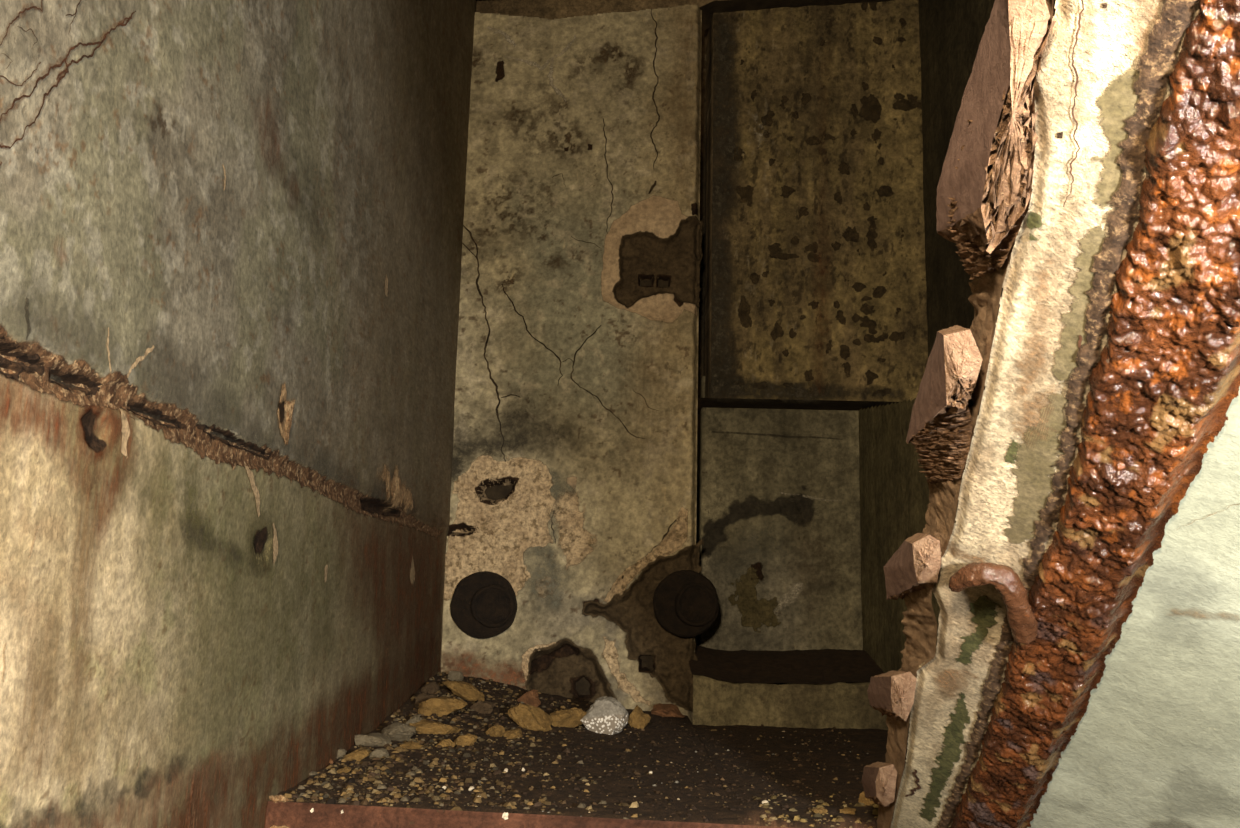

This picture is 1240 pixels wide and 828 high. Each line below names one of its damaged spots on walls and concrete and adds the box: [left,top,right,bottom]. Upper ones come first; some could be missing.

crack [0,0,136,165]
crack [571,118,613,248]
flaking render [601,195,703,323]
crack [648,9,660,194]
damp [698,21,901,402]
peeling [749,185,894,284]
crack [462,225,658,461]
spalling [0,334,295,571]
flaking render [443,455,596,601]
spalling [522,507,703,712]
damp [696,486,814,557]
peeling [948,562,1038,645]